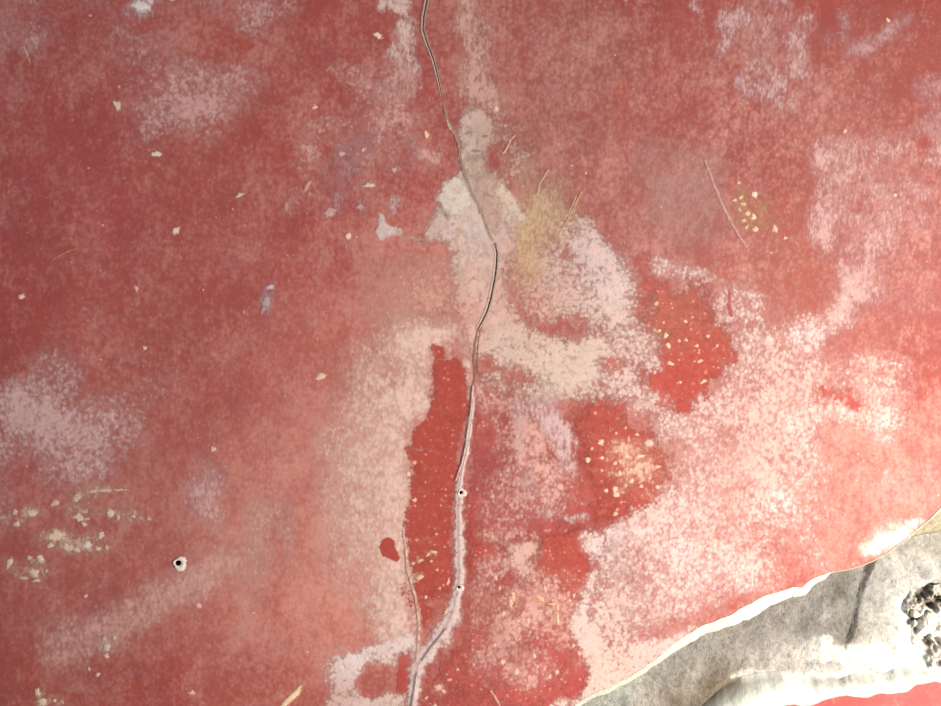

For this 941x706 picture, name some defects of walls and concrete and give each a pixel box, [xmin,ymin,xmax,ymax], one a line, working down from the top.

leakage [807,75,941,333]
crack [403,0,499,706]
leakage [513,382,578,472]
leakage [497,541,538,578]
leakage [539,510,587,524]
flaking render [379,255,941,706]
leakage [860,519,921,556]